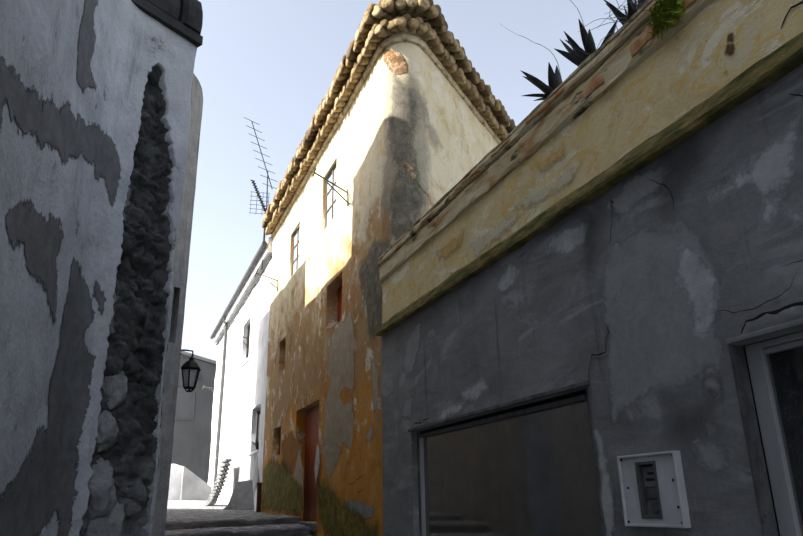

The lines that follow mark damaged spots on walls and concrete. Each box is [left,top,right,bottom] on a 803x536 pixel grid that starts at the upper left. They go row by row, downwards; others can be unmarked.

peeling [76,0,98,94]
spalling [381,49,408,75]
crack [781,1,803,28]
water stain [359,75,437,340]
spalling [0,52,183,536]
crack [715,260,803,335]
peeling [320,311,355,478]
crack [588,322,612,380]